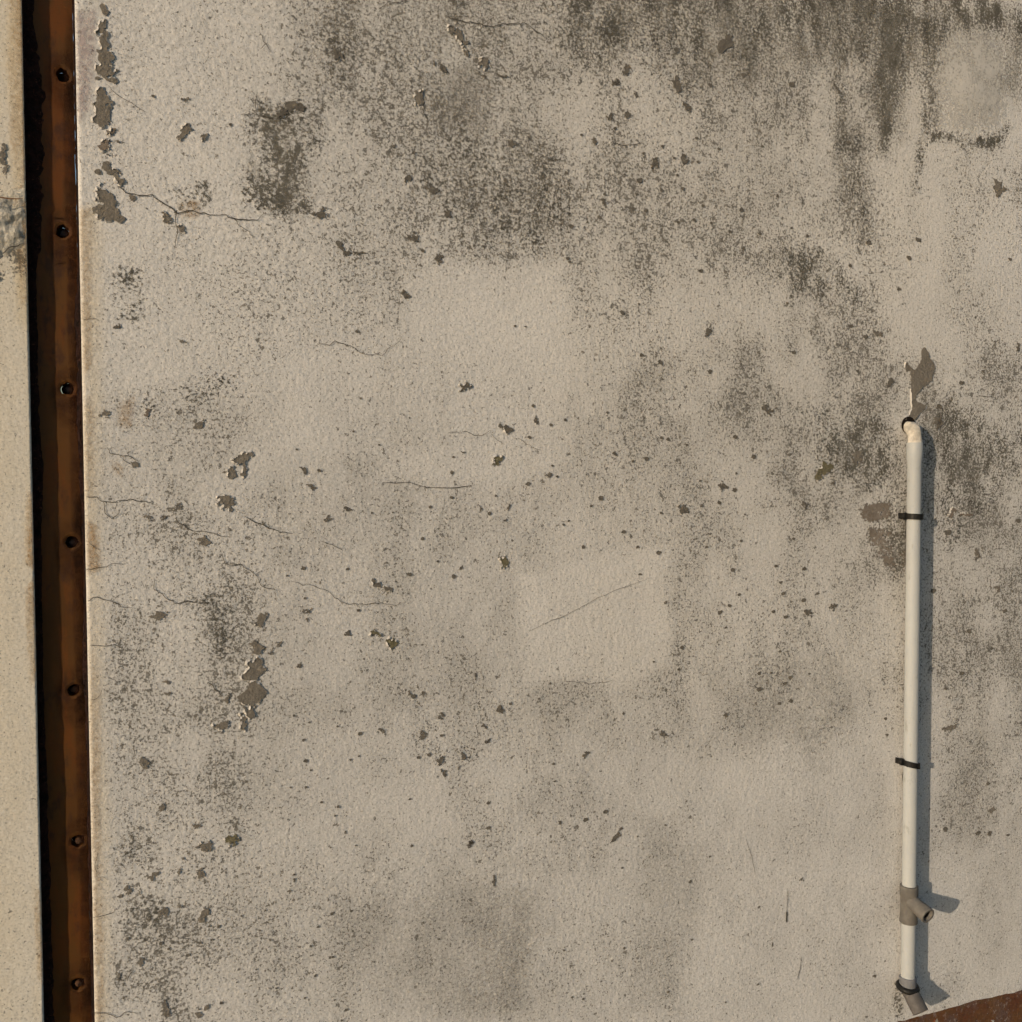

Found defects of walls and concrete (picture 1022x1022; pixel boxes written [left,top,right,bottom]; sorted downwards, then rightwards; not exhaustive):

rust [17,0,27,184]
rust [70,0,91,314]
peeling [90,3,136,223]
crack [118,186,266,245]
water stain [240,98,320,224]
water stain [408,82,587,259]
water stain [530,0,1022,245]
peeling [904,347,945,431]
rust [27,200,46,1022]
peeling [211,640,282,733]
crack [97,497,398,608]
water stain [799,398,907,583]